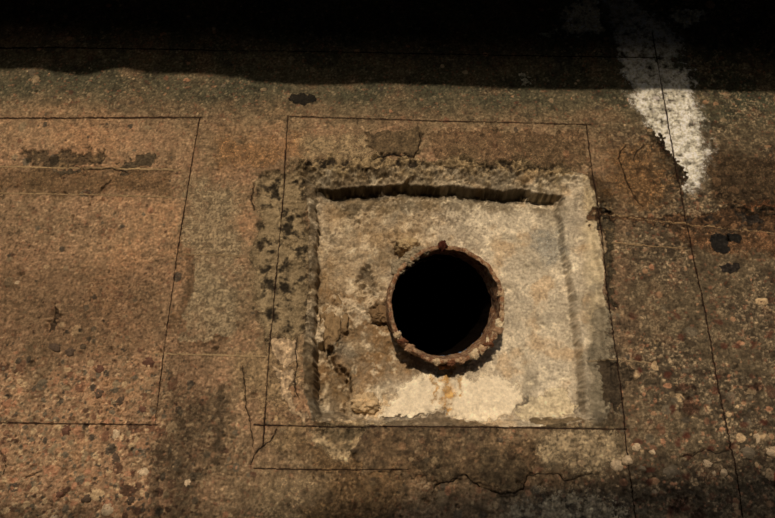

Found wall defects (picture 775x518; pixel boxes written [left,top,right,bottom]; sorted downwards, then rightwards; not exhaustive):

spalling [249,123,591,447]
corrosion [393,331,415,353]
corrosion [433,326,504,415]
peeling [351,411,536,498]
crack [432,473,598,495]